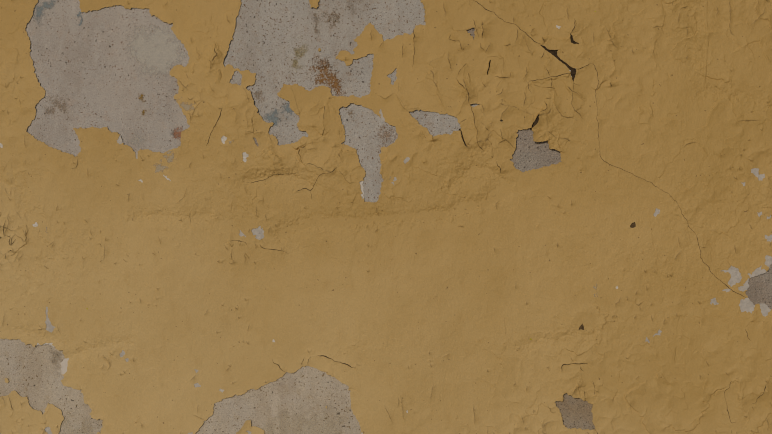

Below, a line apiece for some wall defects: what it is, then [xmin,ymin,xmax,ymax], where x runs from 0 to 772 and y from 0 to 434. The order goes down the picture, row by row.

peeling [26,0,190,159]
peeling [223,0,600,203]
crack [476,1,744,297]
peeling [722,255,772,317]
peeling [0,339,103,434]
peeling [188,366,363,434]
peeling [549,362,595,430]